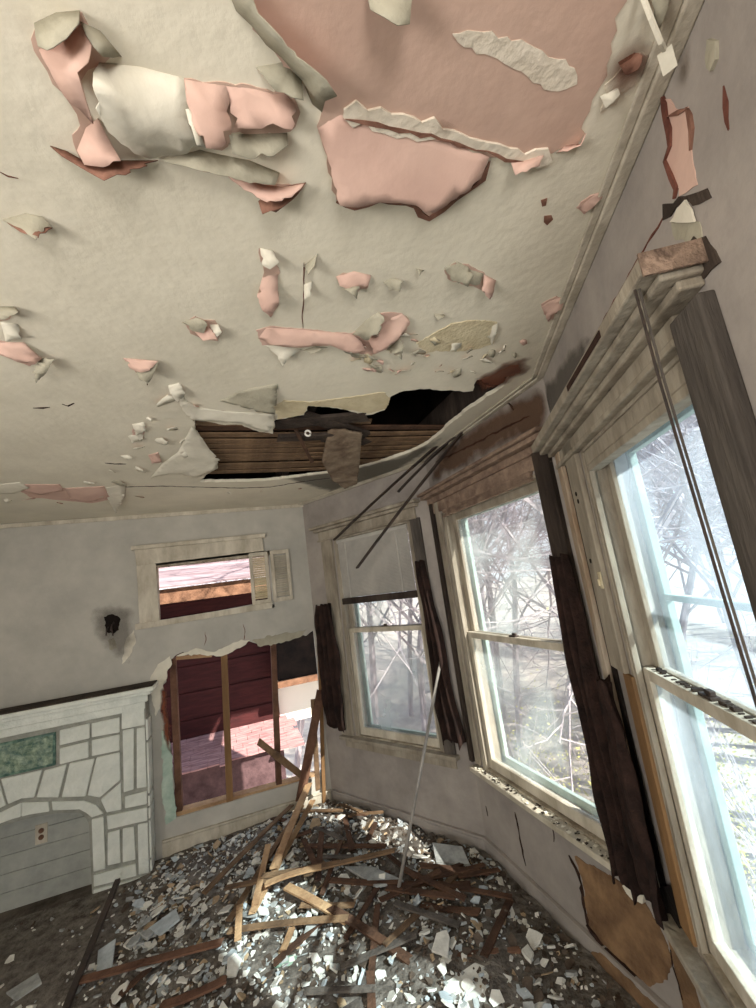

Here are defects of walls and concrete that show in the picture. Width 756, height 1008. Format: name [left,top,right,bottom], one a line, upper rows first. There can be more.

peeling [31,0,648,225]
peeling [660,96,722,279]
peeling [0,306,55,382]
peeling [256,248,527,378]
peeling [121,383,390,478]
water stain [434,347,584,478]
peeling [0,469,145,514]
flaking render [150,630,306,716]
flaking render [161,730,177,824]
crack [515,813,526,866]
flaking render [575,856,701,1008]